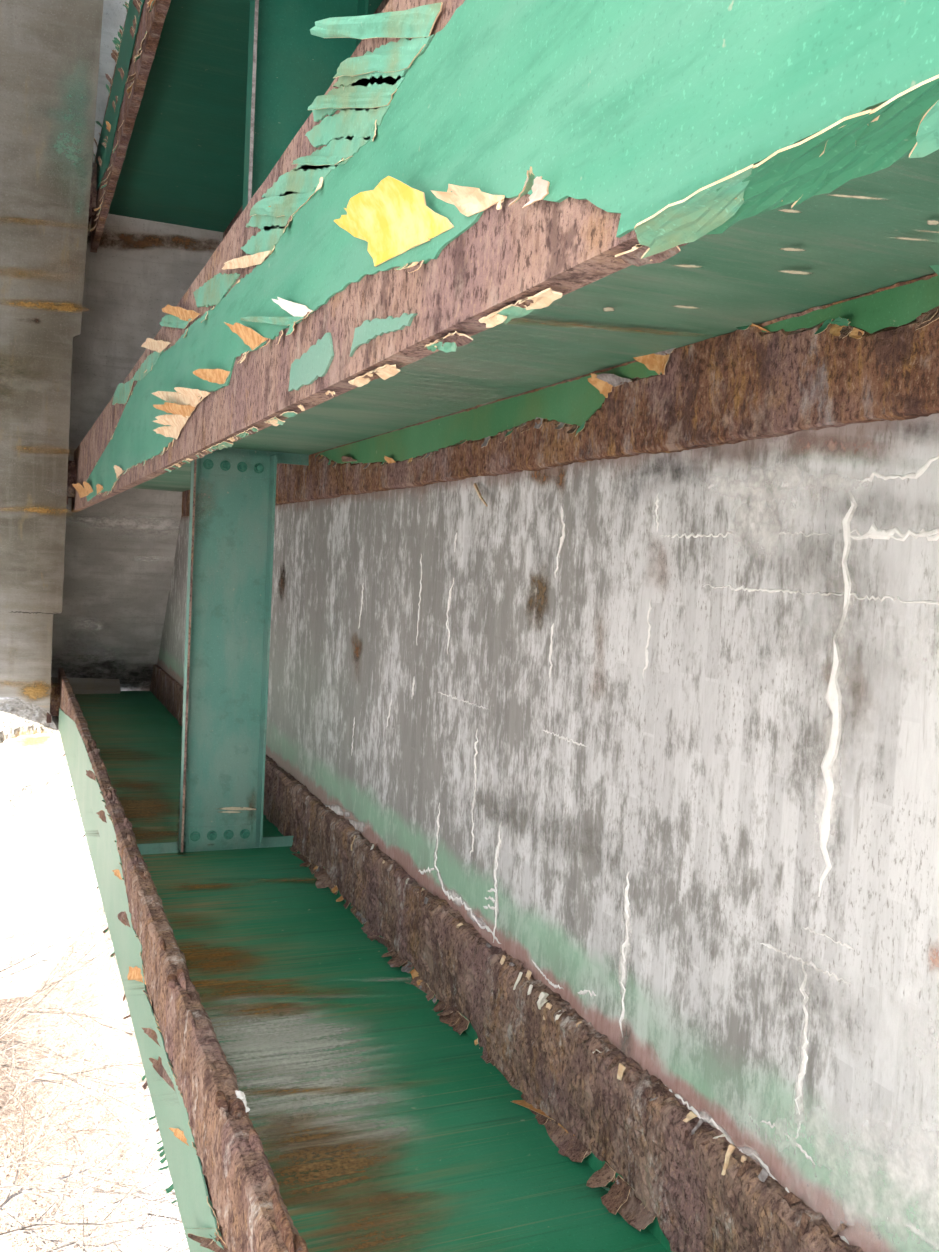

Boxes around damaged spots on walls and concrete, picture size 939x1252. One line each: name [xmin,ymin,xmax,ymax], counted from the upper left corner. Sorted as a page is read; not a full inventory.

corrosion [248,0,259,203]
peeling [334,166,550,273]
peeling [615,75,939,268]
peeling [72,297,313,498]
crack [817,488,939,897]
crack [418,731,502,944]
corrosion [471,936,567,1021]
leakage [531,959,596,997]
crack [619,871,630,1037]
leakage [214,1007,402,1150]
corrosion [586,1162,656,1231]
leakage [810,1116,939,1239]